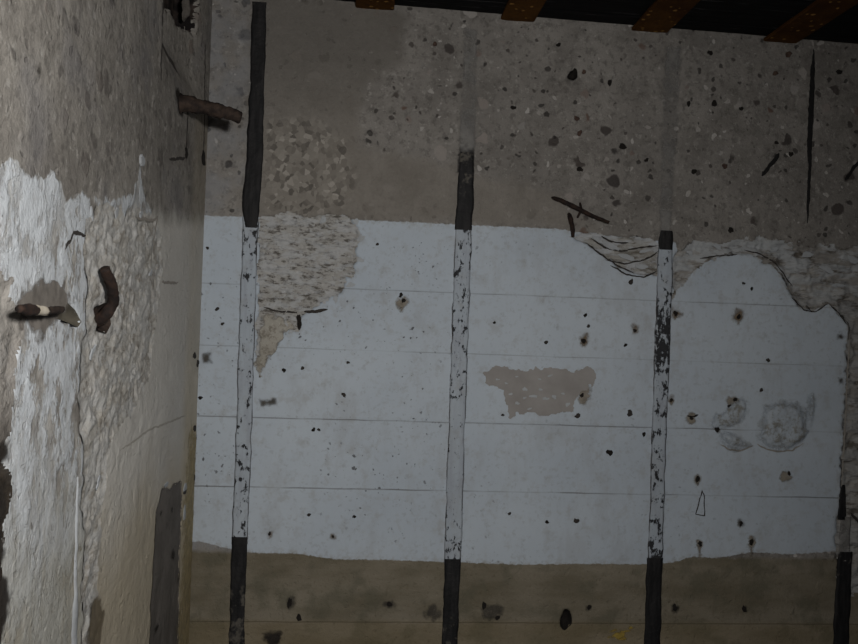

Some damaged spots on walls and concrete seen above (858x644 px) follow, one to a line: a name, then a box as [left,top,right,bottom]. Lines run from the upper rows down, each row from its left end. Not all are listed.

hole [160,0,200,95]
rust [176,89,243,124]
spalling [253,211,365,378]
peeling [570,233,658,285]
flaking render [0,270,27,644]
spalling [78,202,163,644]
peeling [483,365,596,419]
spalling [672,235,858,597]